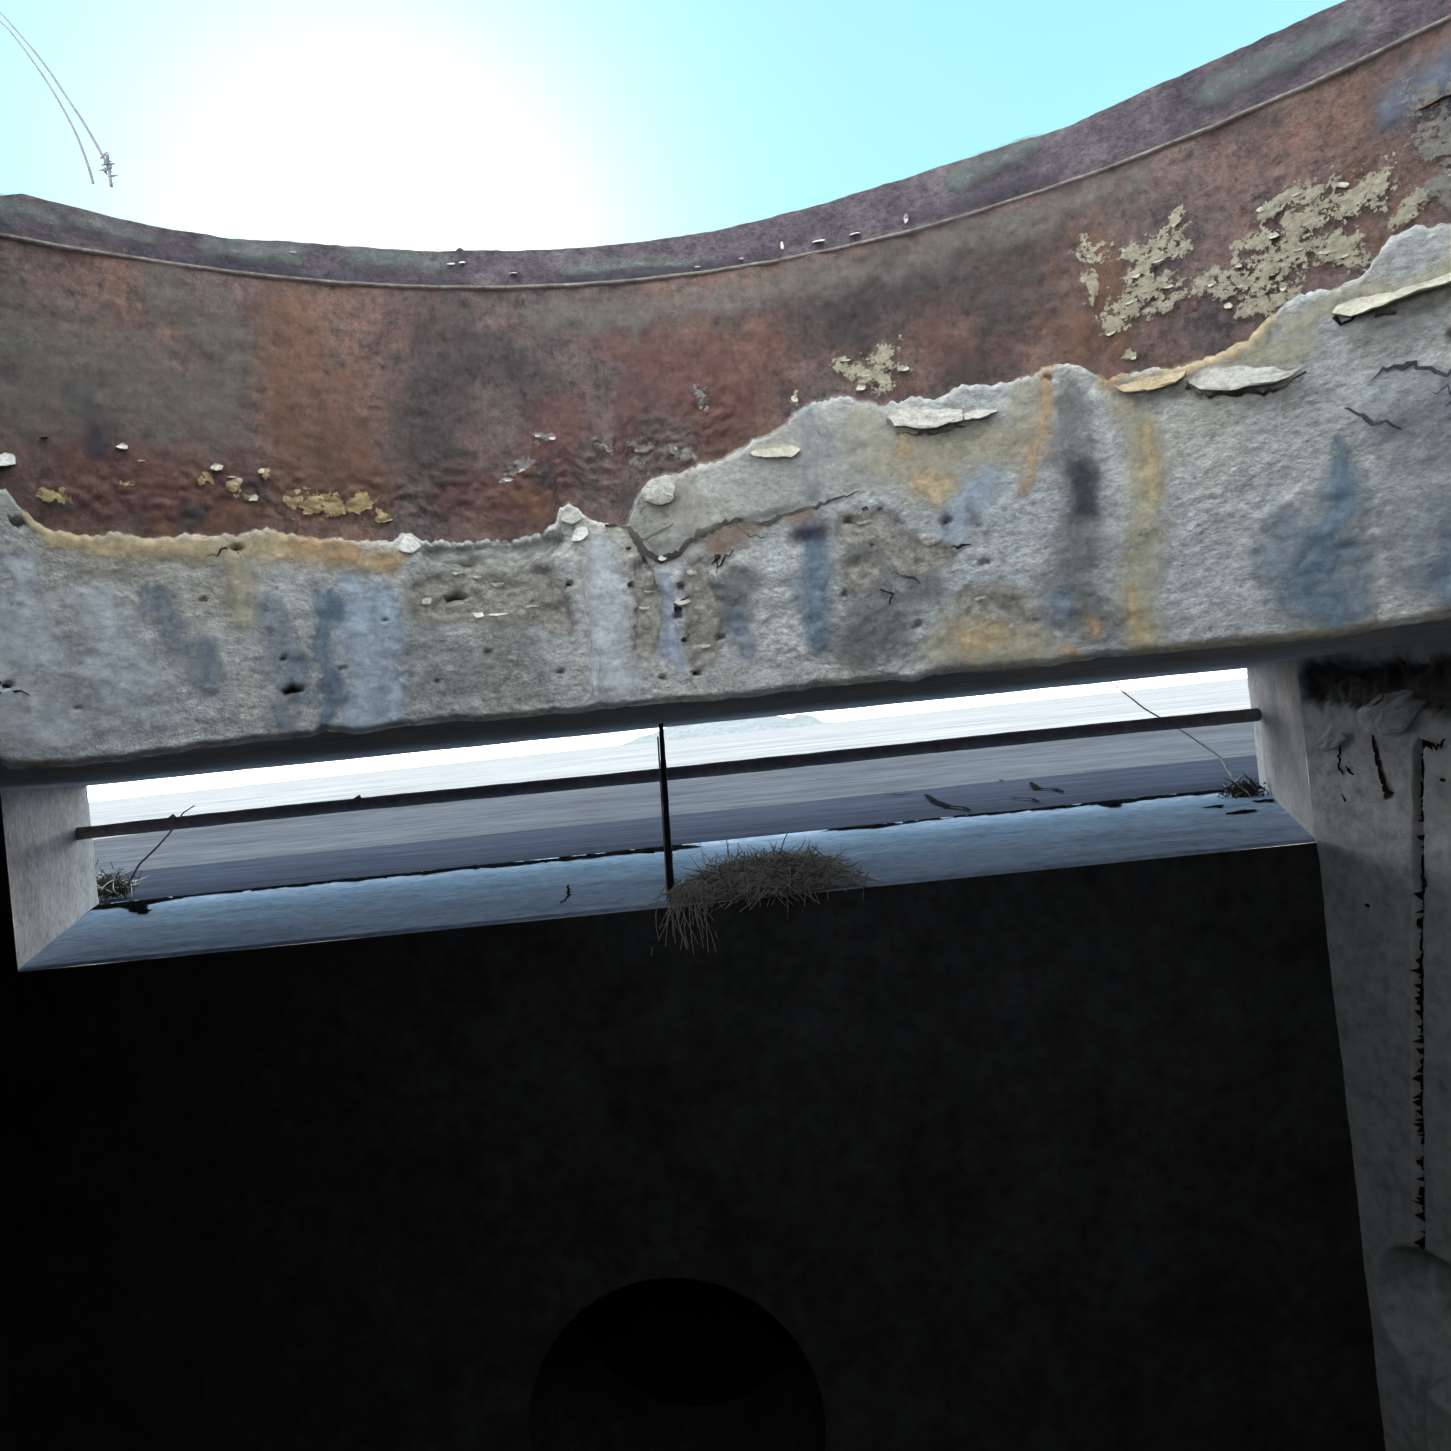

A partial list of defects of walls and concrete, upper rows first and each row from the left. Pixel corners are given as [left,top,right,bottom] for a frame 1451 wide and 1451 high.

peeling [1068,76,1451,399]
peeling [824,335,999,437]
leakage [0,551,86,769]
corrosion [24,434,403,628]
peeling [197,463,270,501]
leakage [260,573,405,738]
peeling [283,486,393,523]
crack [605,491,858,640]
leakage [790,524,942,666]
crack [880,571,921,604]
crack [951,542,971,550]
leakage [1253,435,1371,638]